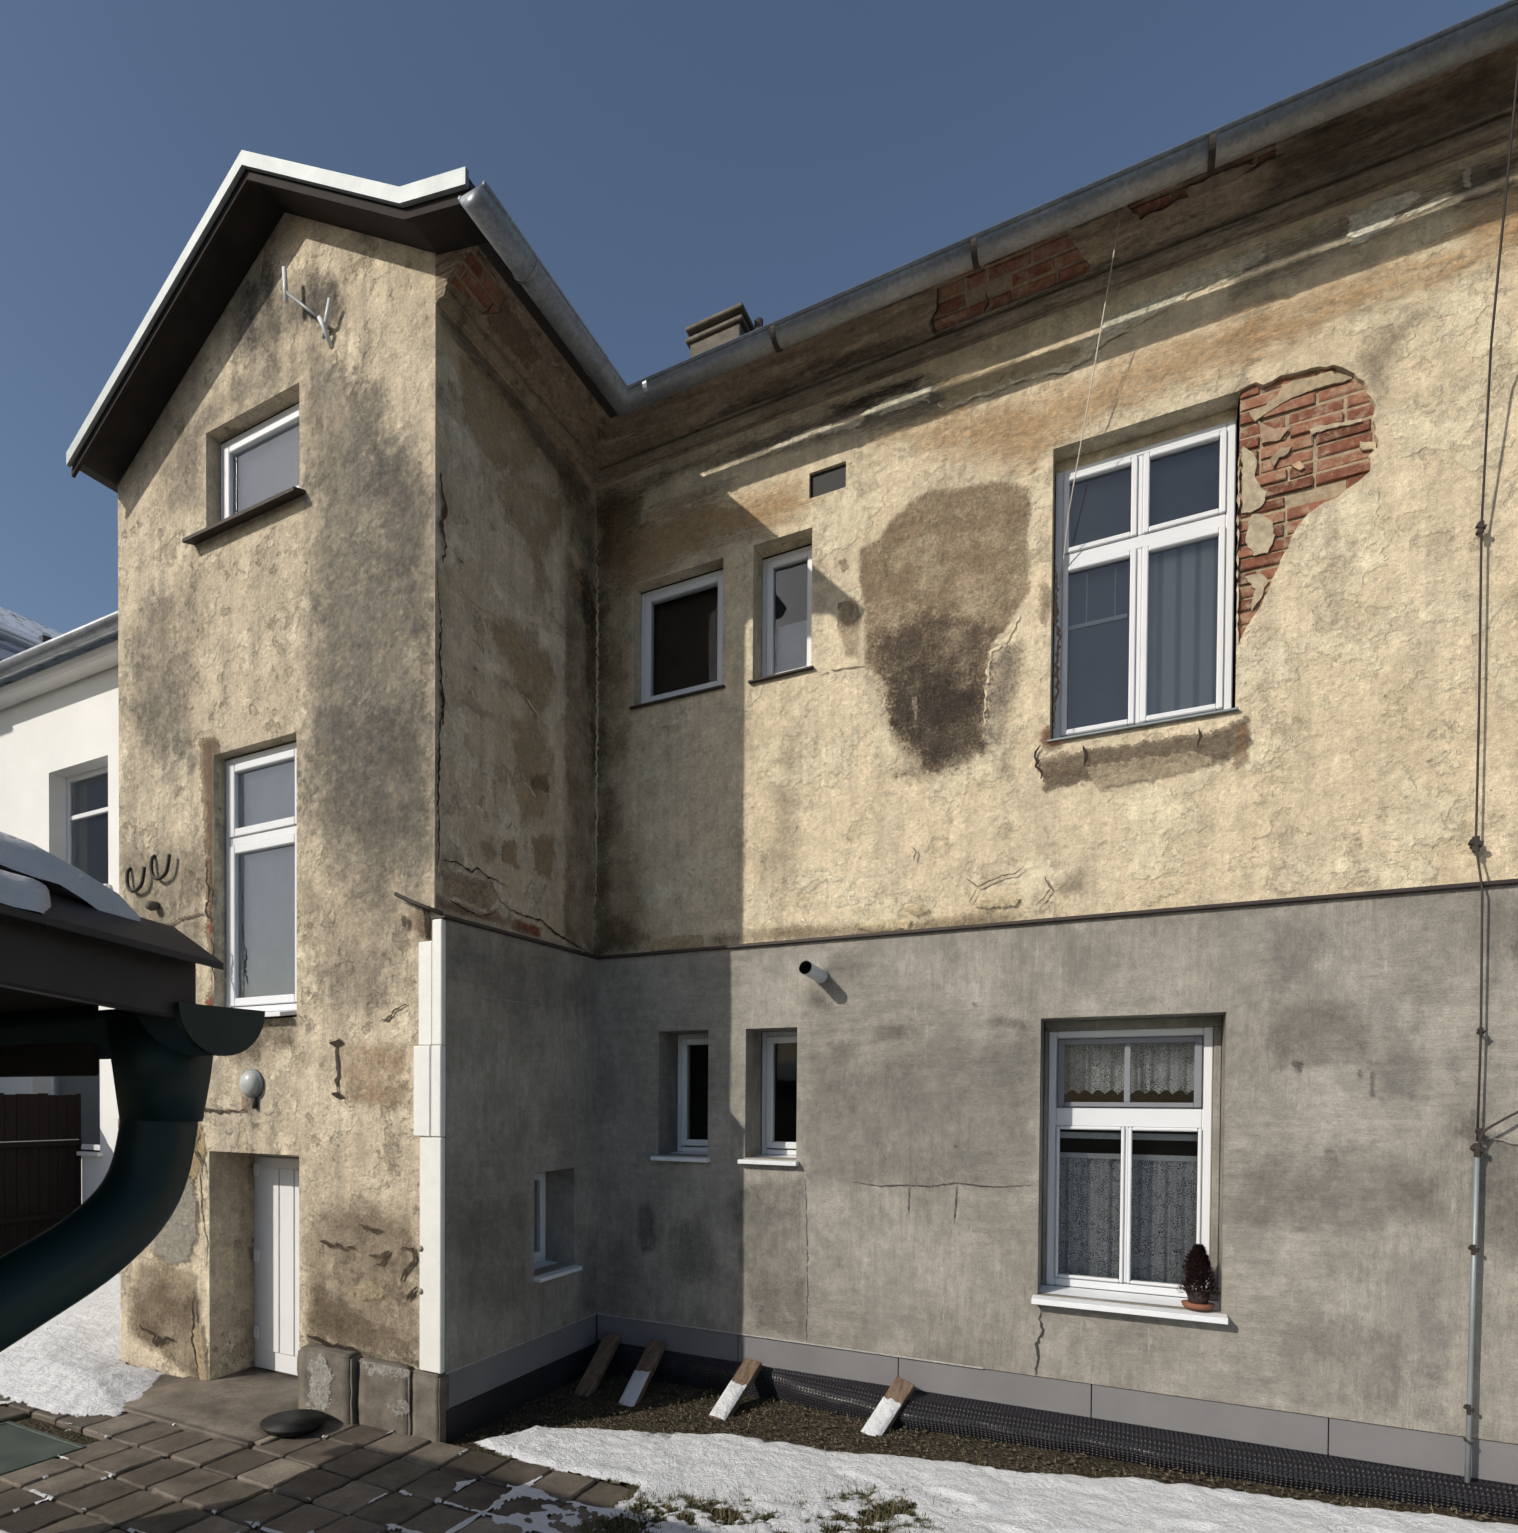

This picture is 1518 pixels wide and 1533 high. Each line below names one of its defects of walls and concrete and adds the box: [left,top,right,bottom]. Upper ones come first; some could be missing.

damp [234,274,343,352]
peeling [861,232,1266,416]
damp [1235,155,1518,297]
flaking render [1236,367,1377,644]
damp [303,371,433,887]
crack [437,472,589,953]
damp [442,313,952,954]
damp [859,483,1030,770]
flaking render [1034,715,1252,791]
crack [856,1182,1030,1218]
crack [1034,1306,1044,1375]